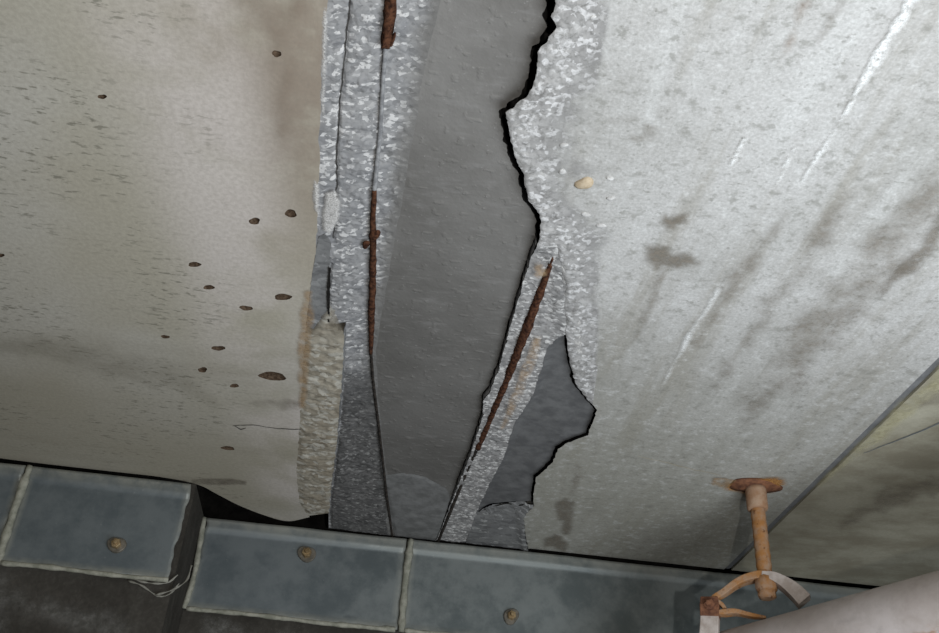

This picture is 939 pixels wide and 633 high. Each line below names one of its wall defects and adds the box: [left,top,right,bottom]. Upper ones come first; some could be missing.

corrosion [381,0,397,49]
damp [845,0,915,114]
corrosion [368,190,377,355]
spalling [296,0,606,552]
crack [438,0,556,535]
corrosion [475,257,554,451]
damp [650,248,693,267]